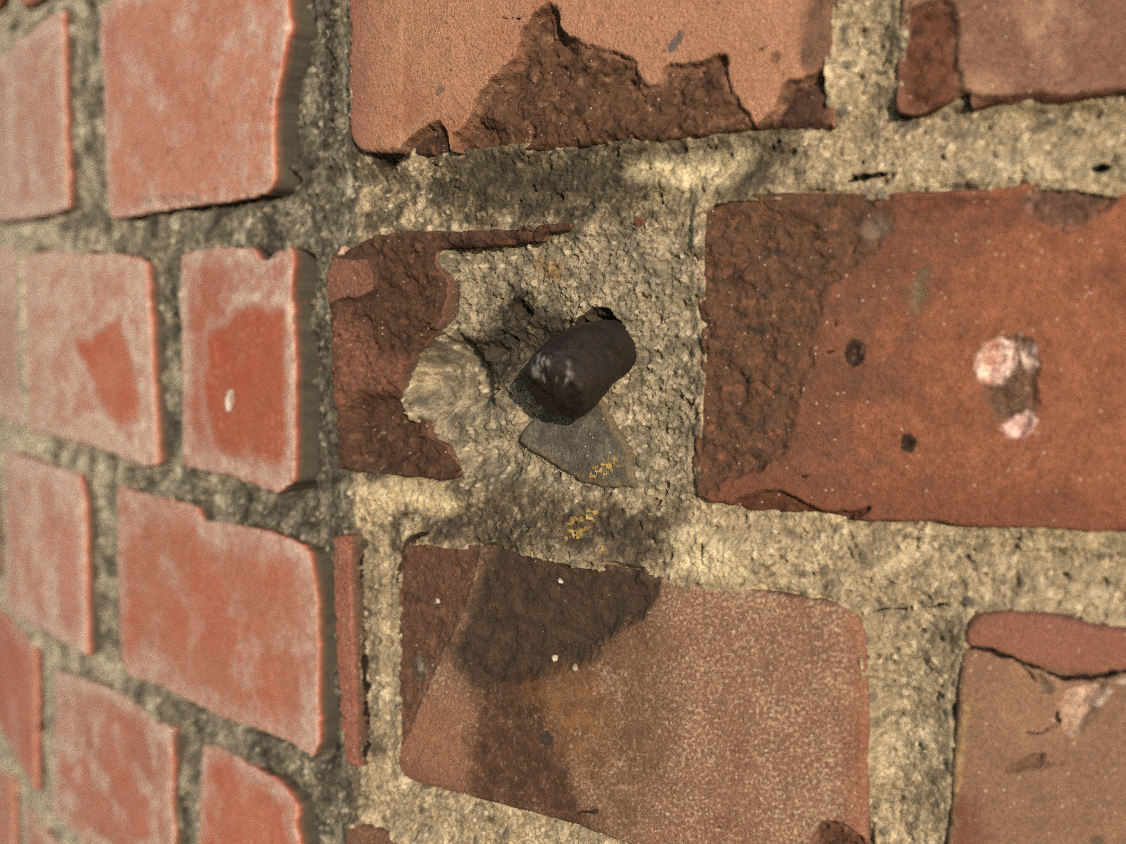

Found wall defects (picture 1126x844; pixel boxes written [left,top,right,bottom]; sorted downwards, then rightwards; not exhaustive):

spalling [397,2,835,157]
spalling [330,223,570,480]
crack [969,646,1126,735]
spalling [809,820,869,844]